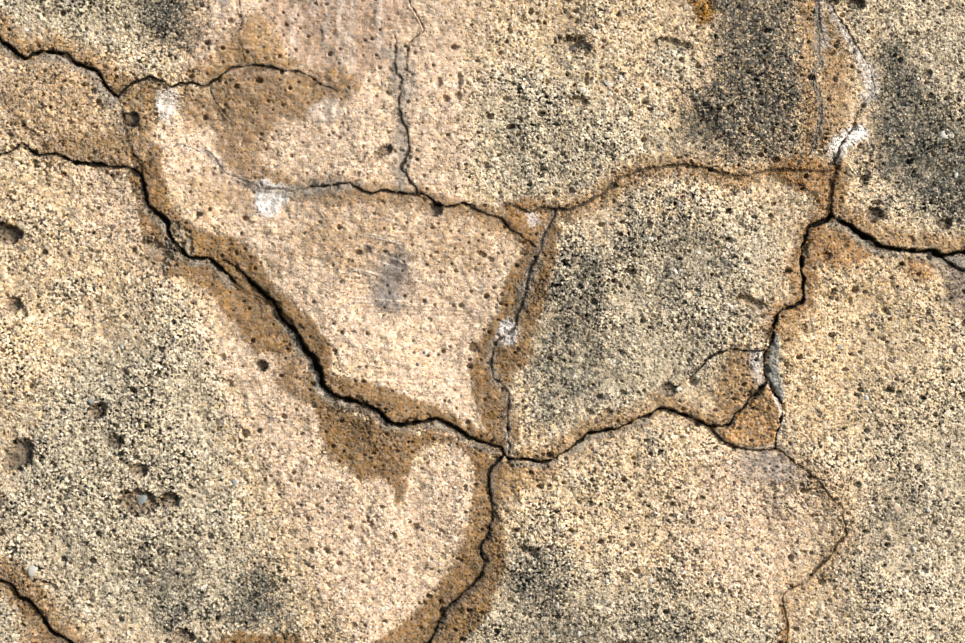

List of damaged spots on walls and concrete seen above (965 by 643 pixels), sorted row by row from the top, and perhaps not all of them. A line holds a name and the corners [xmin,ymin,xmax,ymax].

crack [0,0,334,140]
crack [204,0,536,247]
water stain [670,0,965,234]
crack [812,0,875,152]
crack [0,89,633,643]
water stain [124,146,648,643]
crack [489,163,824,372]
water stain [649,217,740,306]
flaking render [723,333,785,446]
crack [635,138,965,509]
crack [782,514,848,643]